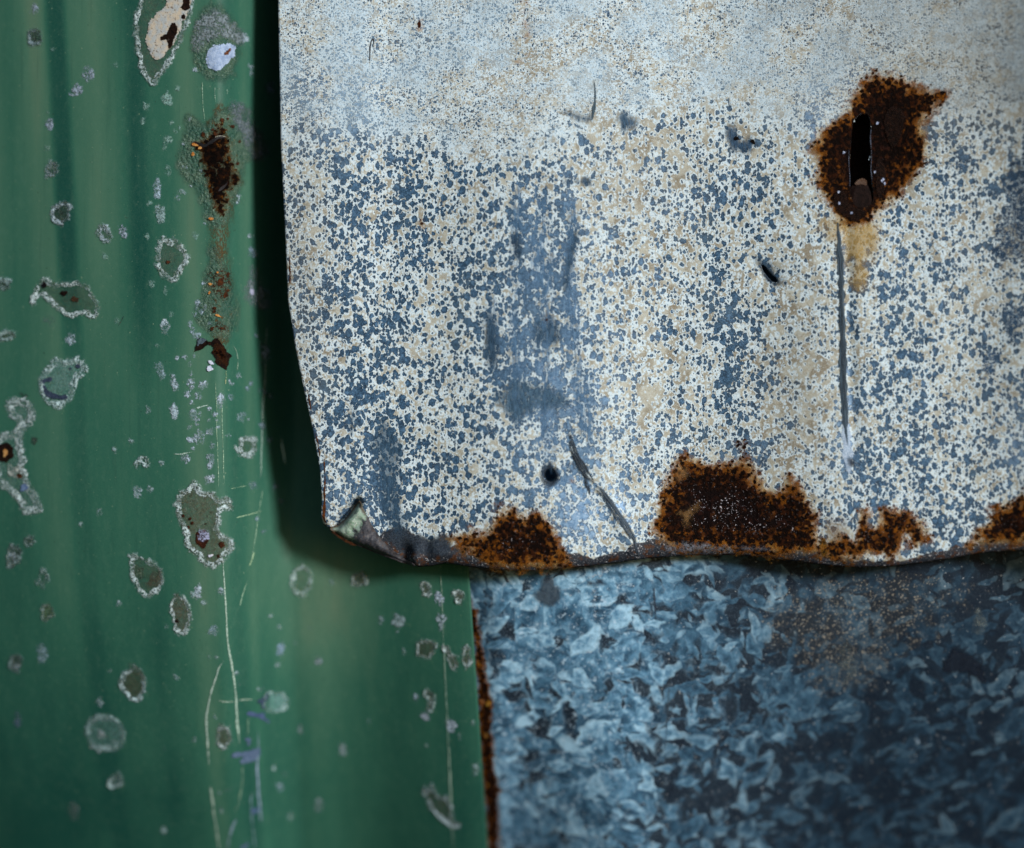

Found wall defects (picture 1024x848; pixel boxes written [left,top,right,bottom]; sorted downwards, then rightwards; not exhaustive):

peeling [134,0,243,85]
corrosion [808,68,953,229]
corrosion [192,106,241,343]
corrosion [443,499,572,575]
corrosion [647,439,935,564]
corrosion [965,487,1024,551]
corrosion [471,600,503,848]